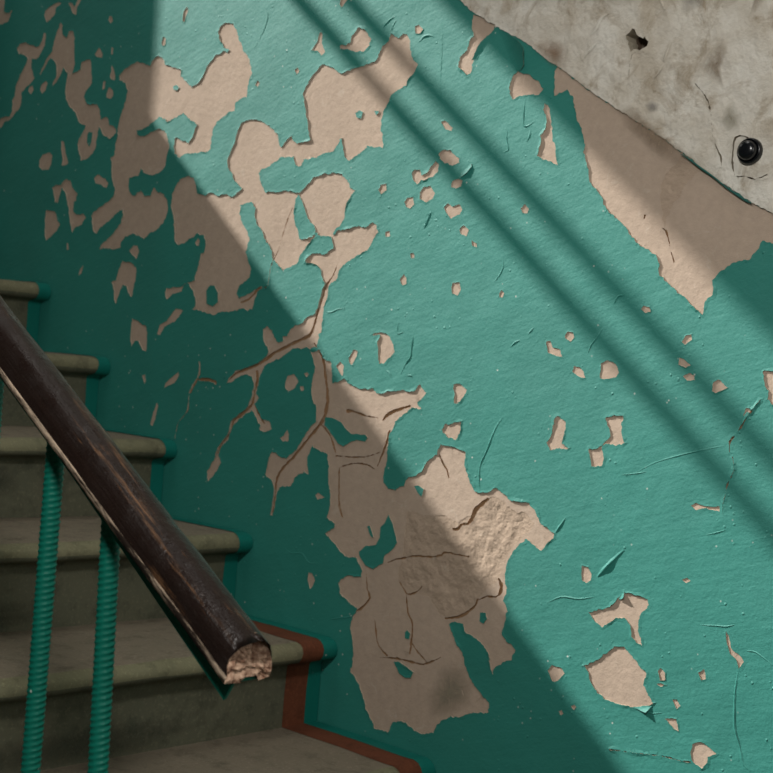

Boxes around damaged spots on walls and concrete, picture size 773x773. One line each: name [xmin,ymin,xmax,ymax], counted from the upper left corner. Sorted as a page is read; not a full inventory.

peeling [456,12,773,318]
crack [241,208,293,303]
peeling [0,0,557,738]
crack [173,266,411,517]
peeling [544,413,571,453]
peeling [585,411,628,469]
crack [719,397,764,517]
spalling [545,663,566,685]
peeling [581,589,667,713]
crack [608,746,692,764]
spalling [686,739,719,771]